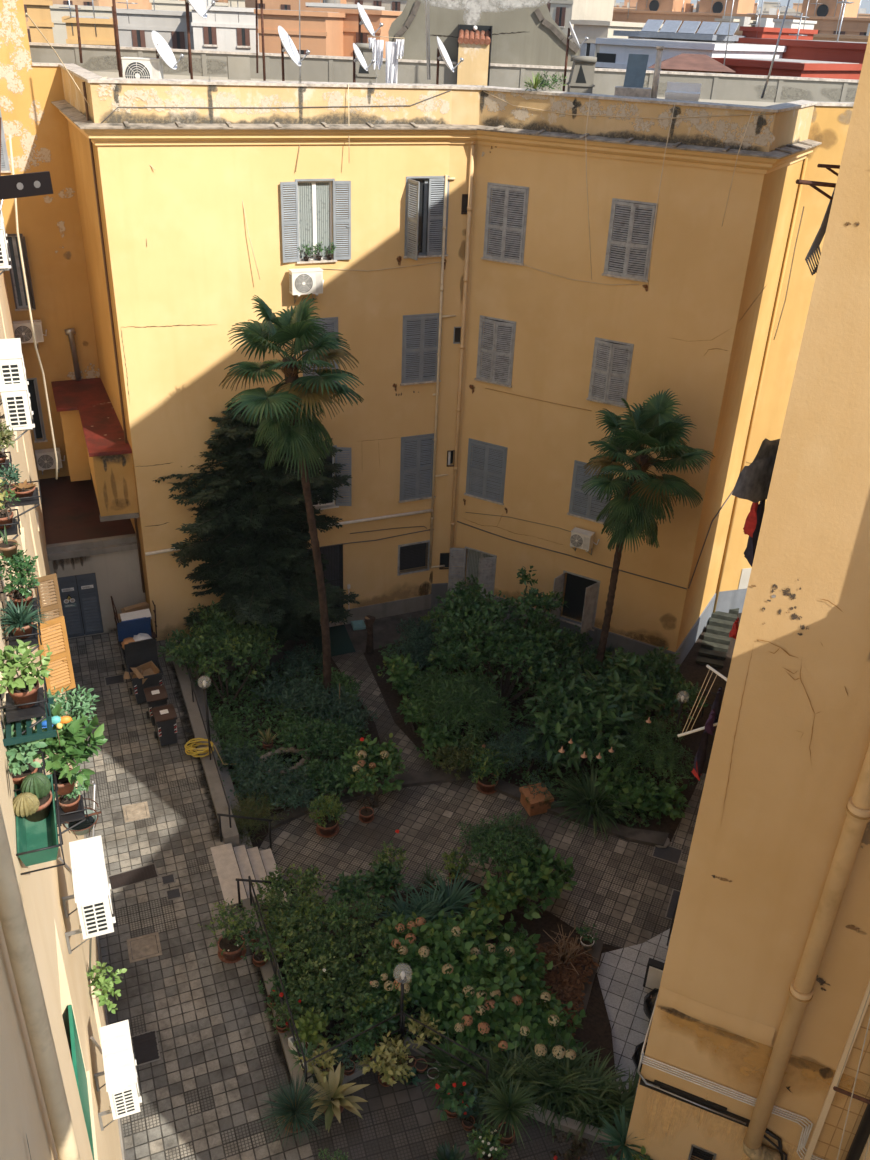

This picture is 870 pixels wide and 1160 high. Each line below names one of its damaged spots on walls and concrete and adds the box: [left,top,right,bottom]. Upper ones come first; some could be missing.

peeling [0,0,51,172]
peeling [95,77,299,115]
peeling [322,91,450,114]
peeling [480,89,775,149]
crack [121,325,201,401]
peeling [762,578,809,636]
crack [721,639,823,822]
water stain [796,1061,850,1086]